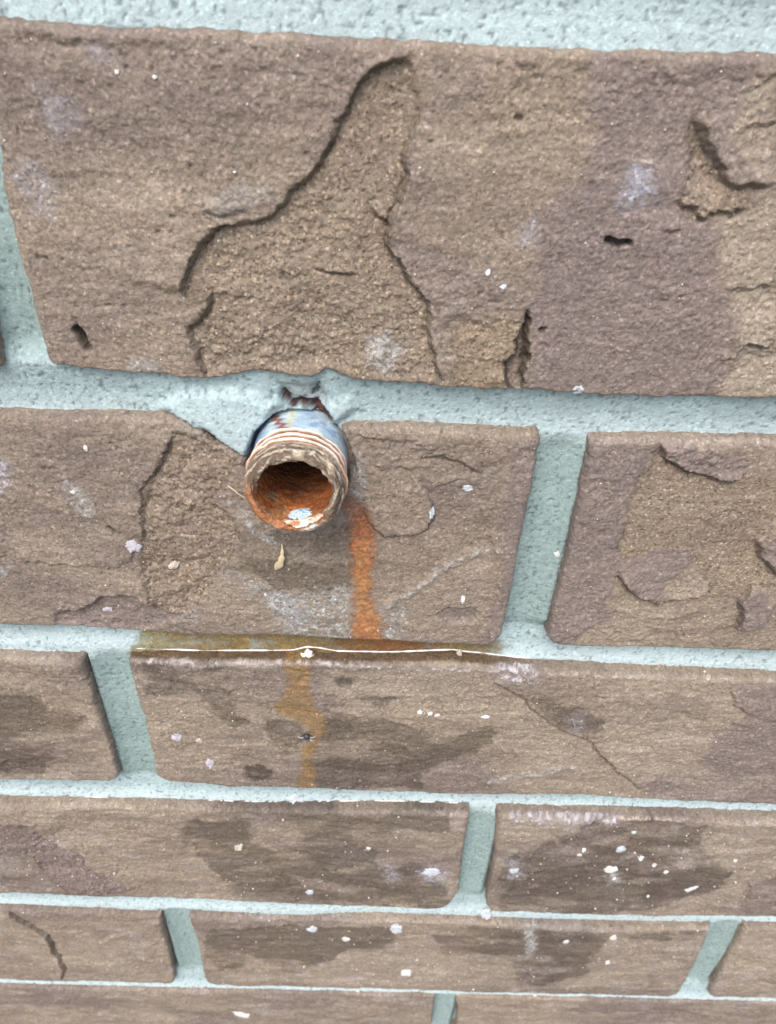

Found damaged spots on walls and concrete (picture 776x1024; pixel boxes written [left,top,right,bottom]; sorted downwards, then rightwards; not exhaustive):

crack [179,50,414,378]
crack [358,109,444,381]
crack [678,118,776,221]
crack [503,309,531,389]
spalling [617,452,776,599]
crack [9,912,67,979]
water stain [0,695,84,774]
water stain [205,918,395,970]
rust [130,513,508,788]
water stain [183,717,493,909]
water stain [132,525,666,731]
water stain [434,810,732,986]